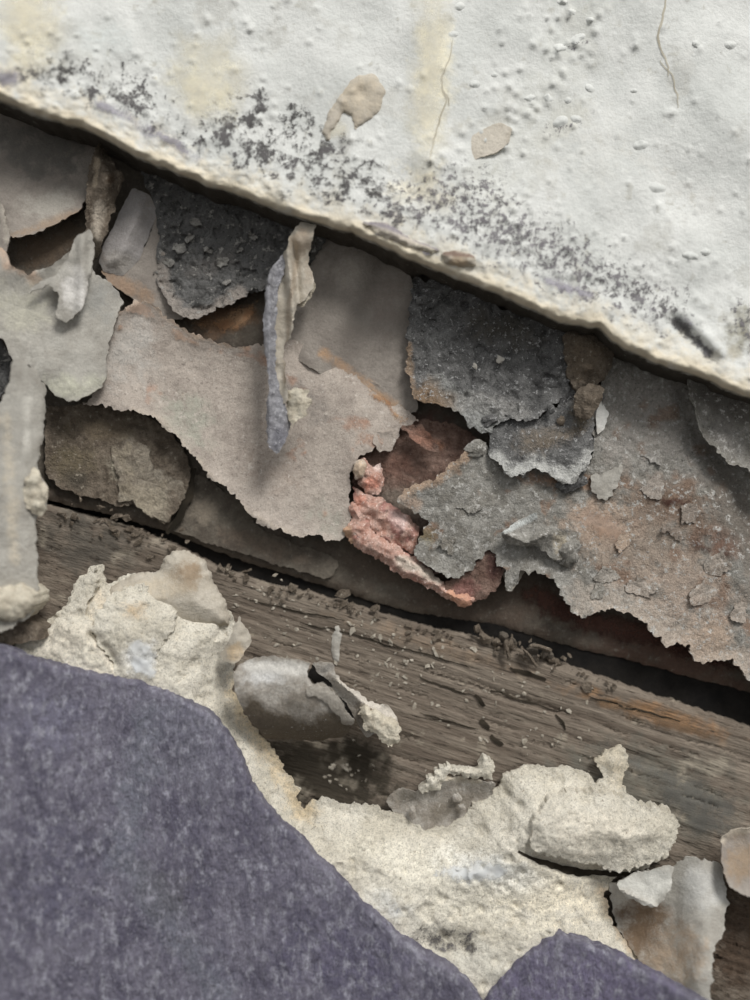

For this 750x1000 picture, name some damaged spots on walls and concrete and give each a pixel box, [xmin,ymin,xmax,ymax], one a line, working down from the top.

damp [0,50,712,358]
peeling [0,114,750,681]
mould [729,298,750,353]
peeling [110,550,402,747]